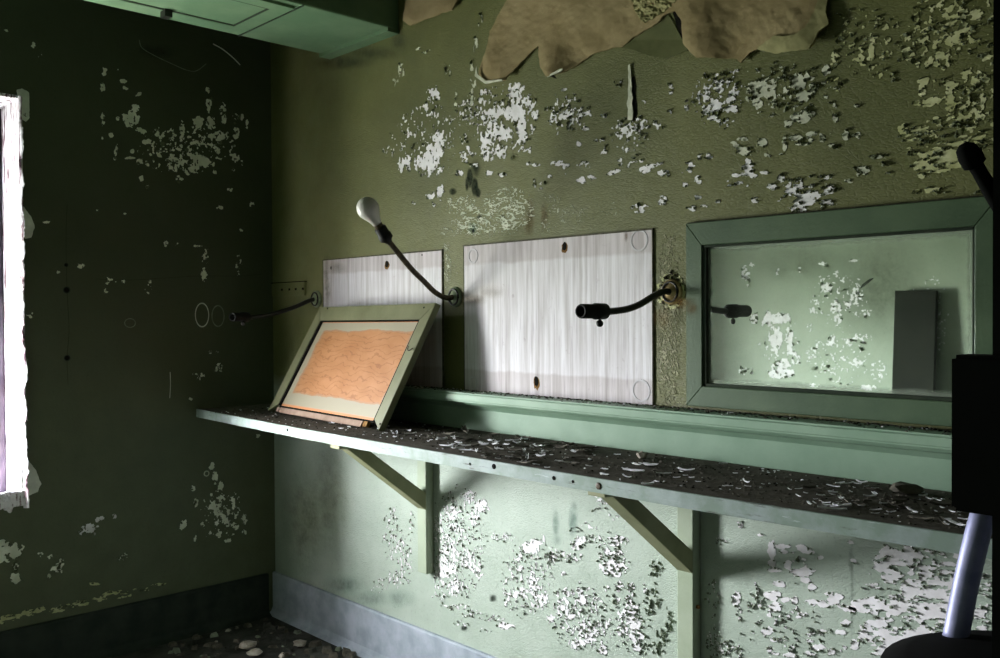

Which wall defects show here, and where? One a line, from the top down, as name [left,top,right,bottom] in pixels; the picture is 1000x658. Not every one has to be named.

peeling [100,68,249,189]
peeling [382,0,993,213]
peeling [191,462,248,543]
peeling [788,479,968,526]
spalling [0,539,25,585]
peeling [37,552,64,579]
peeling [0,582,166,625]
peeling [371,507,414,593]
peeling [431,484,673,656]
peeling [704,533,959,658]
peeling [973,573,991,630]